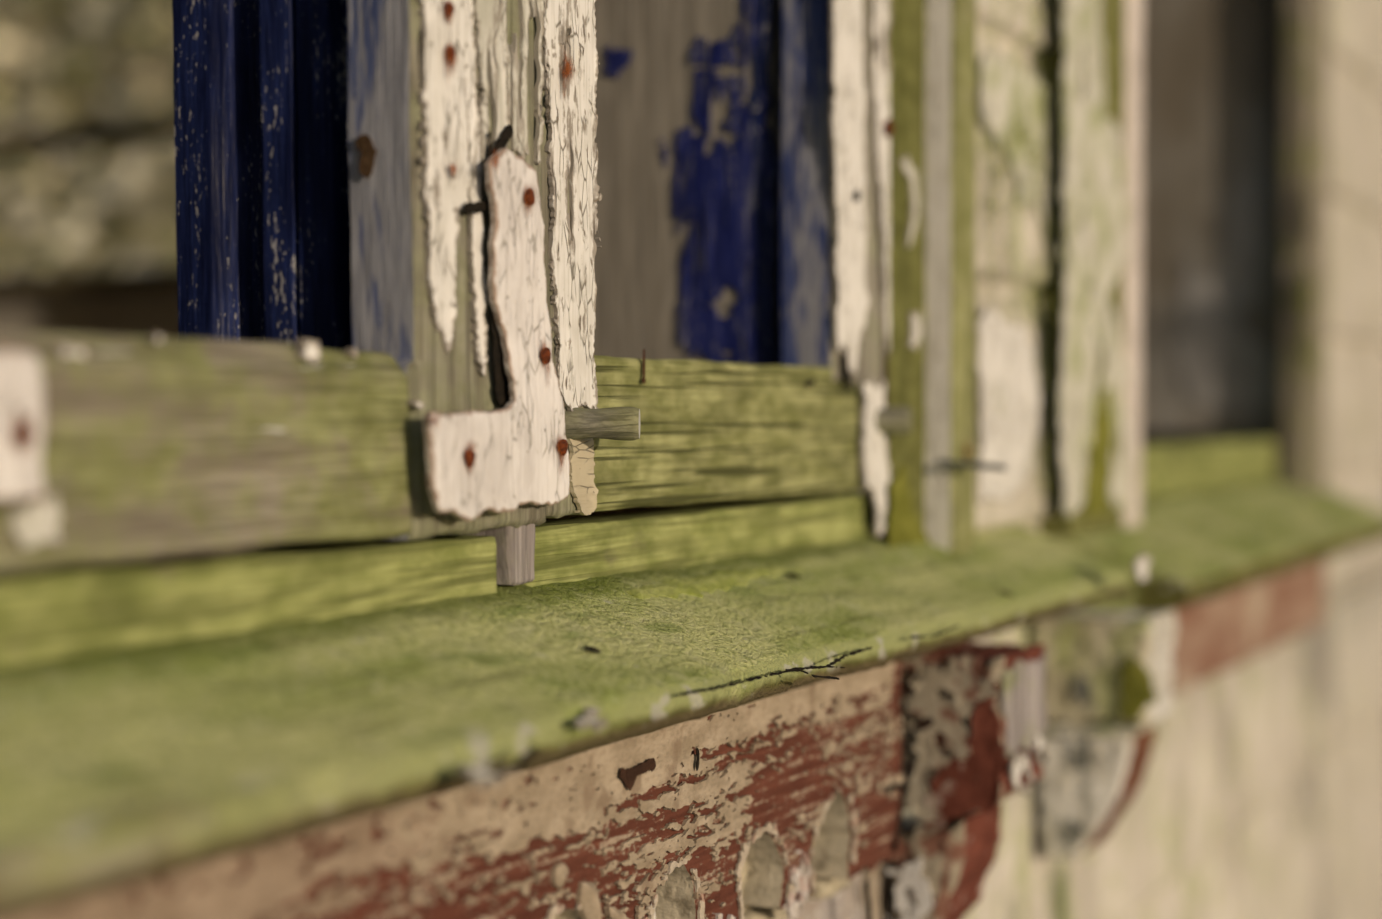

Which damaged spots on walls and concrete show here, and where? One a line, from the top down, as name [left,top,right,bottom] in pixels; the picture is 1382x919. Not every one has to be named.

peeling [417,0,633,412]
corrosion [563,57,573,78]
peeling [660,0,782,365]
peeling [829,0,922,537]
peeling [975,0,1134,516]
peeling [10,651,1049,919]
crack [678,647,873,696]